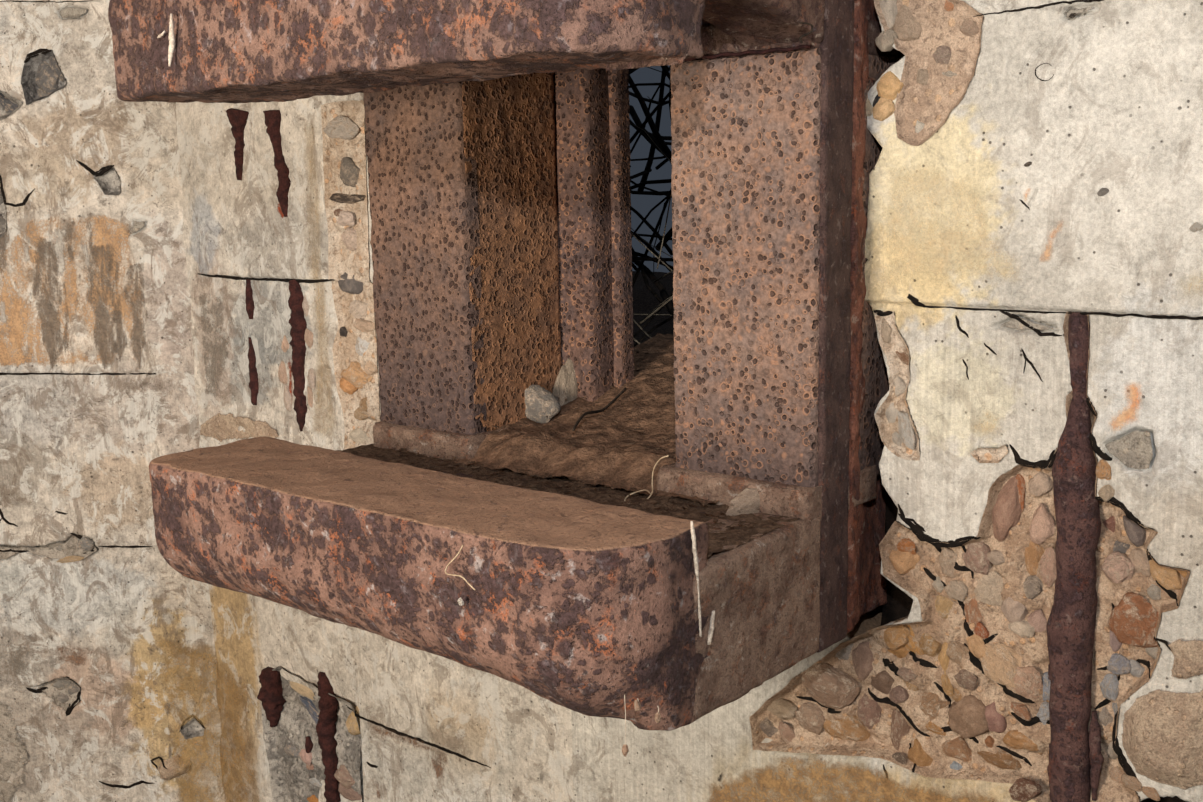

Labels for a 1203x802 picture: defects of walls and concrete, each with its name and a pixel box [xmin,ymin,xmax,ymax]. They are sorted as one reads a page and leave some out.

crack [973,0,1104,17]
spalling [0,49,67,120]
spalling [866,0,984,146]
crack [873,294,1203,382]
spalling [749,311,1190,802]